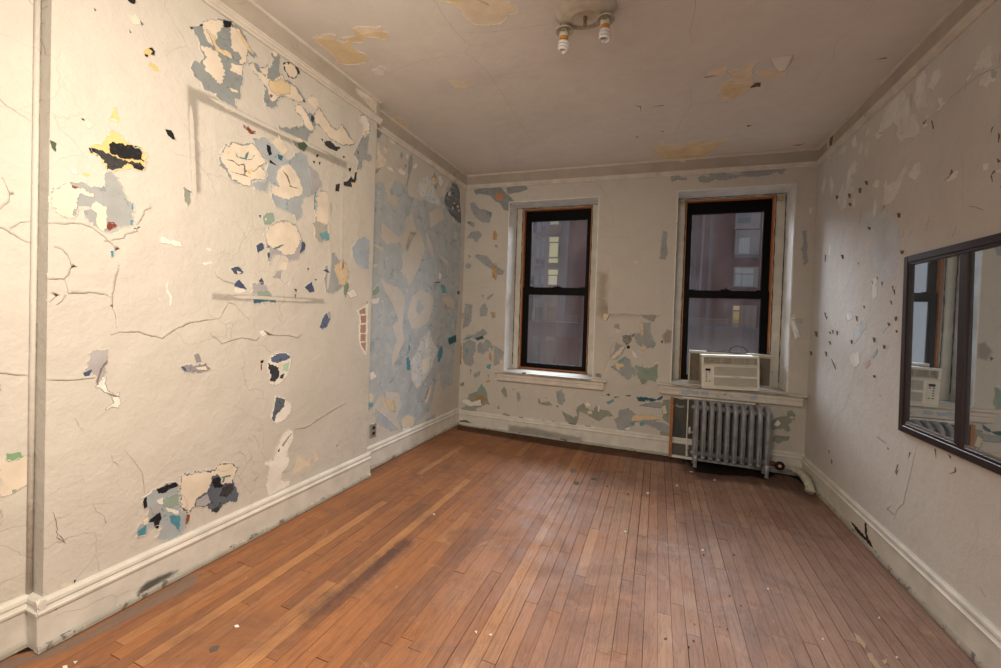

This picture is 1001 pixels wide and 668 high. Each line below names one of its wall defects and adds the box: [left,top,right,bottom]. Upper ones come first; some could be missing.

peeling [127,0,145,33]
peeling [142,47,160,72]
peeling [48,106,150,234]
peeling [183,186,192,207]
peeling [189,17,529,432]
peeling [670,169,787,184]
spalling [83,348,121,410]
peeling [179,353,211,374]
peeling [537,313,770,436]
spalling [260,351,294,497]
peeling [0,452,28,526]
crack [48,480,108,544]